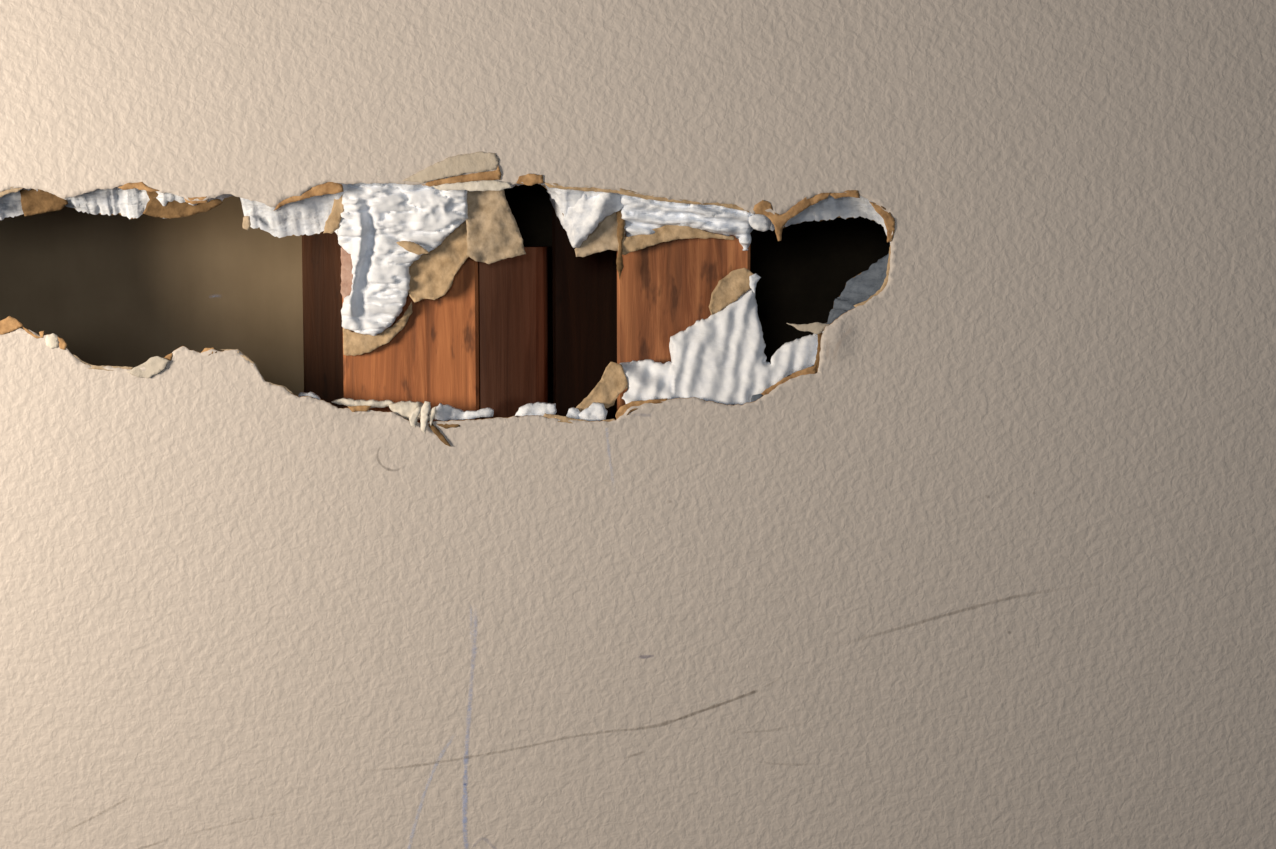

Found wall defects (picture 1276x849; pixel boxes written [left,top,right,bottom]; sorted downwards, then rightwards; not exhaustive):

spalling [201,348,494,447]
flaking render [0,152,895,423]